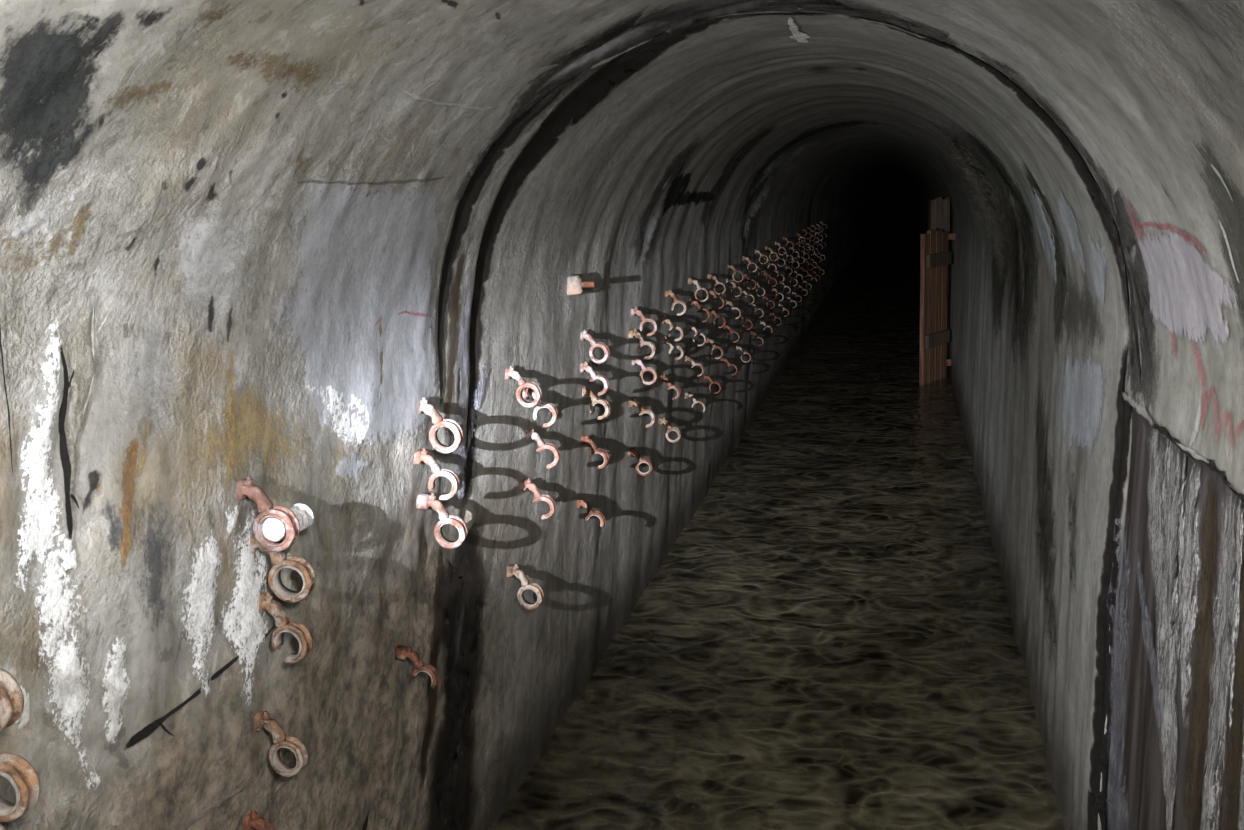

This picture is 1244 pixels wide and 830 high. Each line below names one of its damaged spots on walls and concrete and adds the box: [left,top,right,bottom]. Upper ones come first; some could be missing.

leakage [0,11,167,213]
peeling [1138,135,1244,346]
leakage [15,321,131,790]
crack [56,304,108,540]
rust [120,421,151,567]
leakage [142,506,169,617]
rust [190,353,311,484]
crack [405,11,1244,830]
rust [1184,473,1244,830]